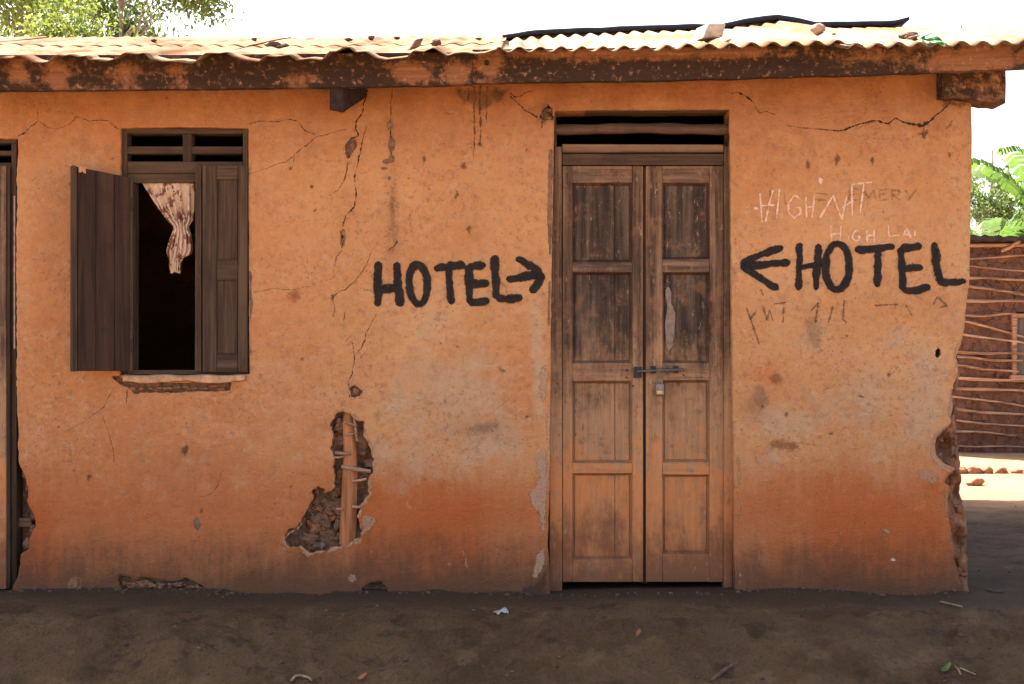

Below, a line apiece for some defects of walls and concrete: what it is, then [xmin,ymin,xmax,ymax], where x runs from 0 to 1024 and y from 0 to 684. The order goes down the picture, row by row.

crack [18,104,118,136]
crack [731,92,952,138]
spalling [344,137,357,161]
crack [249,88,398,398]
spalling [113,374,231,394]
spalling [282,410,377,557]
peeling [530,365,549,531]
spalling [917,345,969,592]
spalling [19,472,36,552]
spalling [119,576,204,588]
peeling [532,549,545,578]